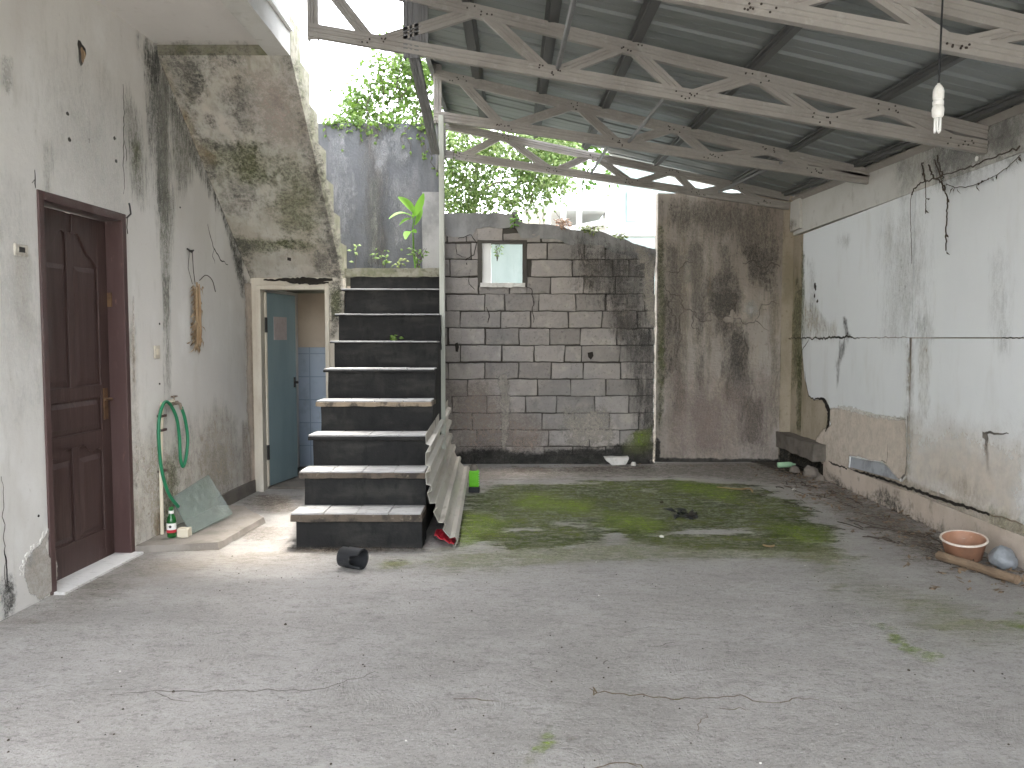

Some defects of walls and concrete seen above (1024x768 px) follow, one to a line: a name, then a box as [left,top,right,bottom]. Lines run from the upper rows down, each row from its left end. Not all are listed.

leakage [128,46,416,384]
leakage [455,204,852,491]
crack [664,260,907,361]
peeling [816,405,907,478]
crack [829,416,1023,525]
crack [0,476,8,591]
spalling [19,528,58,599]
crack [110,671,375,702]
crack [589,687,818,731]